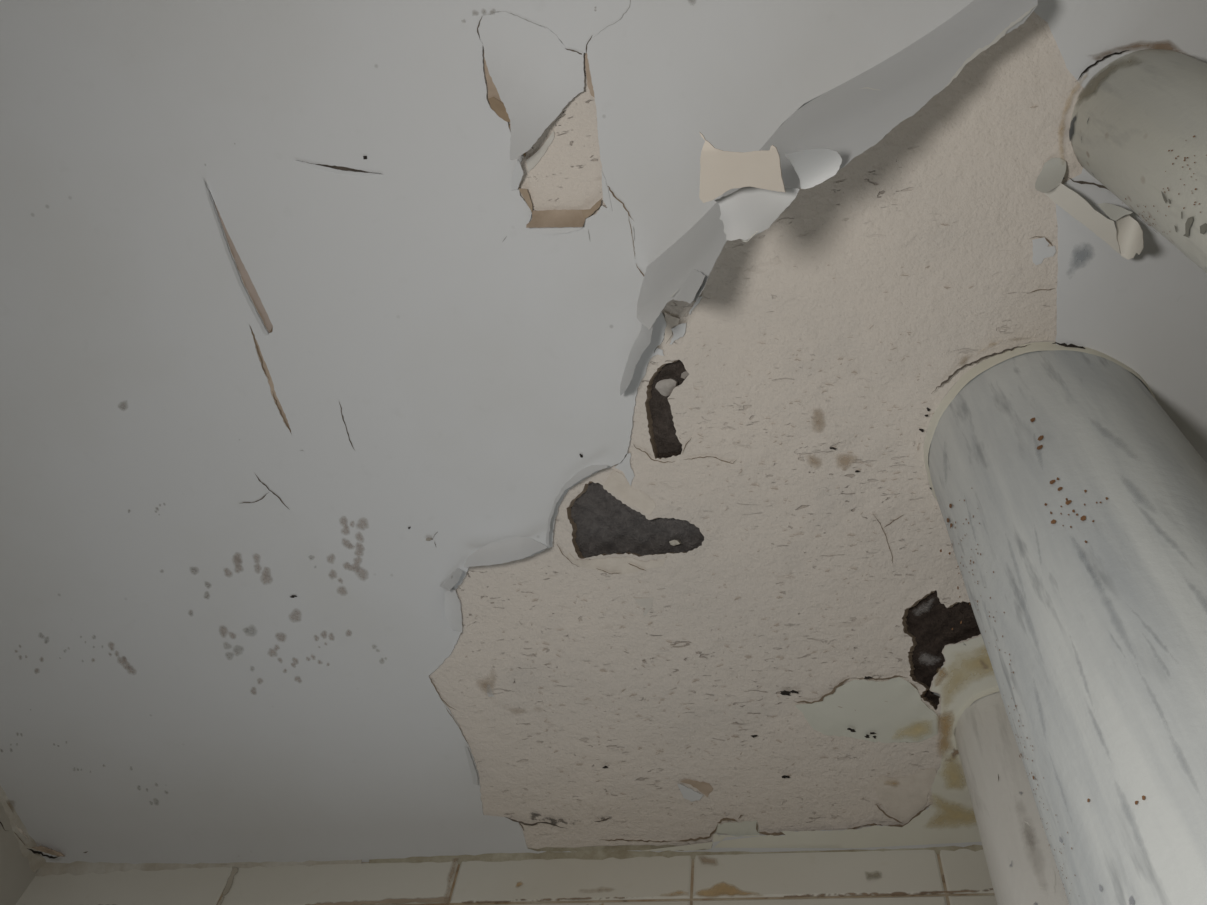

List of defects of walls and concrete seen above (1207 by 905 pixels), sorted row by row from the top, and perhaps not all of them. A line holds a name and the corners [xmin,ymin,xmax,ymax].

peeling [429,0,1144,849]
damp [903,716,961,787]